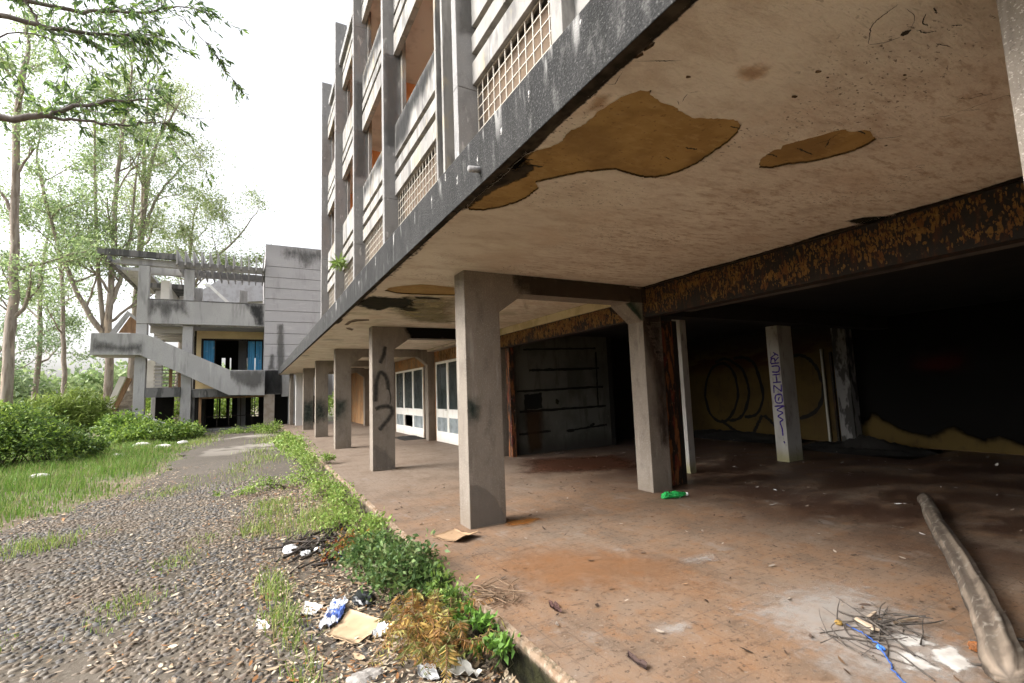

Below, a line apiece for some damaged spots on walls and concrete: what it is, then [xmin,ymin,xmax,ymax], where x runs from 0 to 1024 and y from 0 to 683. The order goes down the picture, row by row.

peeling [467,88,742,211]
peeling [758,128,887,169]
water stain [230,0,698,394]
water stain [151,301,185,314]
peeling [384,284,455,296]
water stain [94,343,141,351]